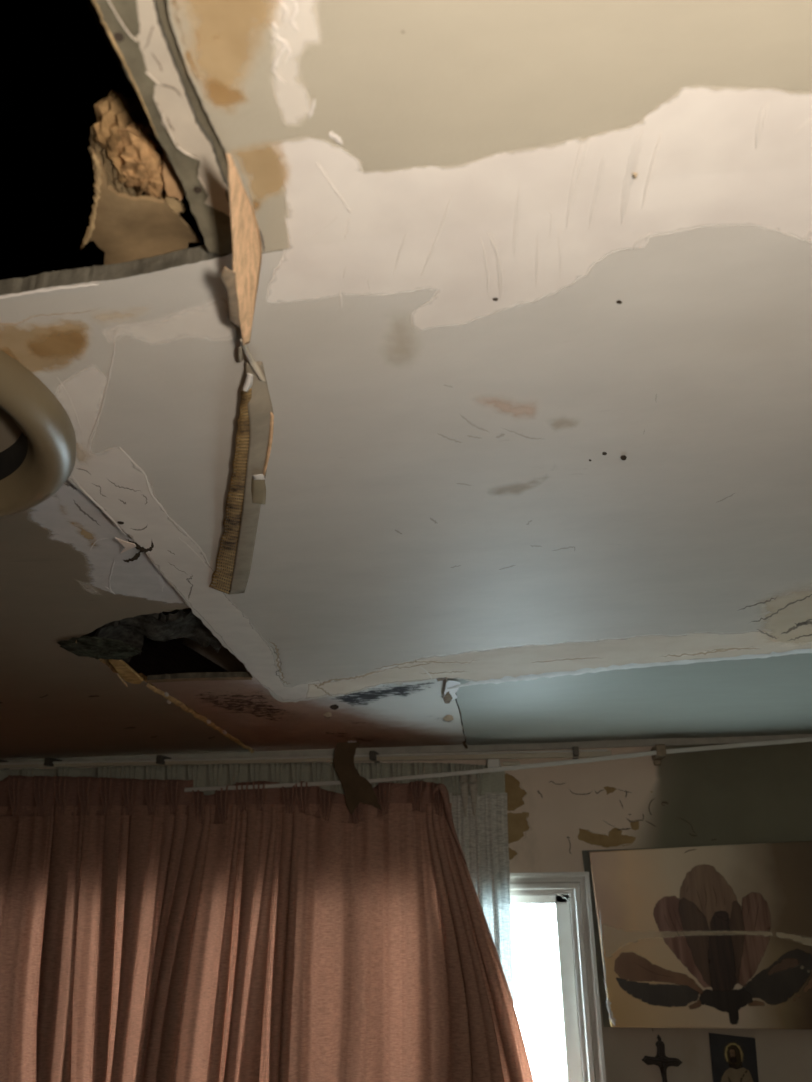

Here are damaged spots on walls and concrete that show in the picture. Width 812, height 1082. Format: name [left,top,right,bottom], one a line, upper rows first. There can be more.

water stain [186,0,268,104]
peeling [108,0,230,216]
water stain [0,309,122,372]
crack [64,468,193,600]
water stain [312,660,473,706]
peeling [505,773,532,860]
peeling [578,820,639,849]